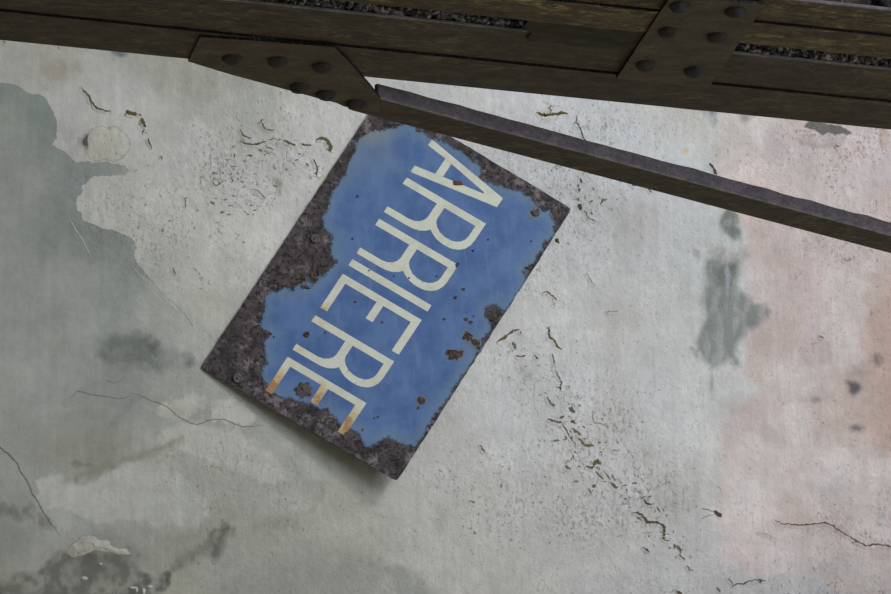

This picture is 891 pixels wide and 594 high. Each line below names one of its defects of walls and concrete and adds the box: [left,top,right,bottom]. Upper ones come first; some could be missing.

peeling [0,40,309,324]
water stain [688,209,774,401]
water stain [93,327,201,378]
crack [70,377,263,427]
peeling [155,386,285,490]
crack [0,447,59,534]
peeling [33,460,210,557]
crack [758,519,891,551]
water stain [127,569,173,594]